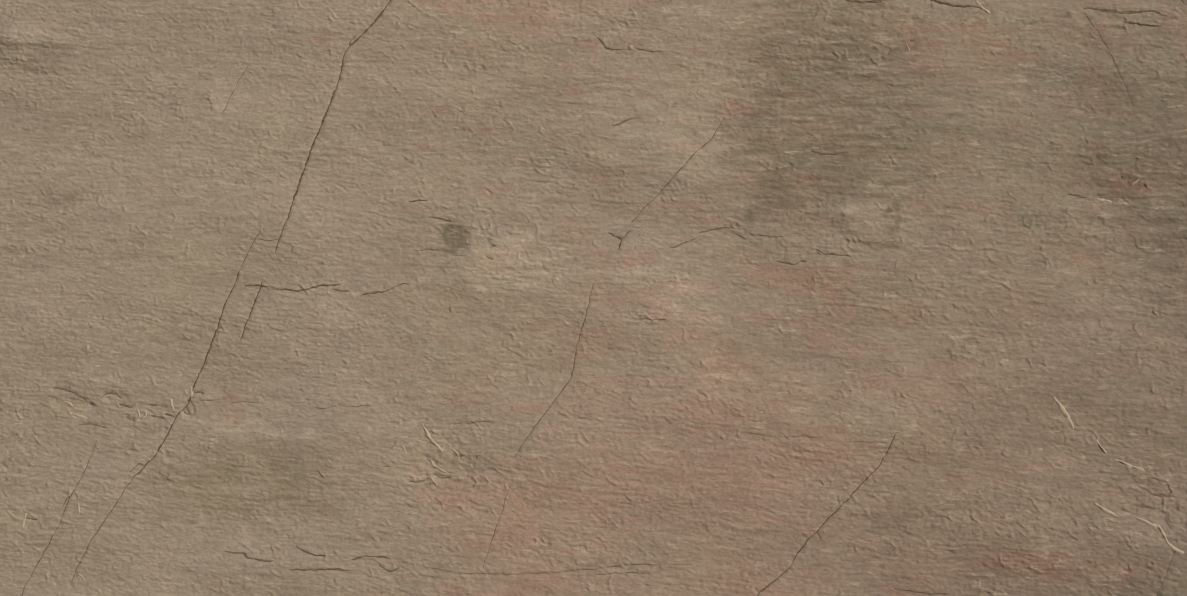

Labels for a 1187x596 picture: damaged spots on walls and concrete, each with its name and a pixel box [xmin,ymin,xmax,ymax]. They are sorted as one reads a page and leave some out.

crack [608,119,724,248]
crack [71,0,408,583]
crack [514,283,594,458]
crack [225,487,696,575]
crack [742,432,897,596]